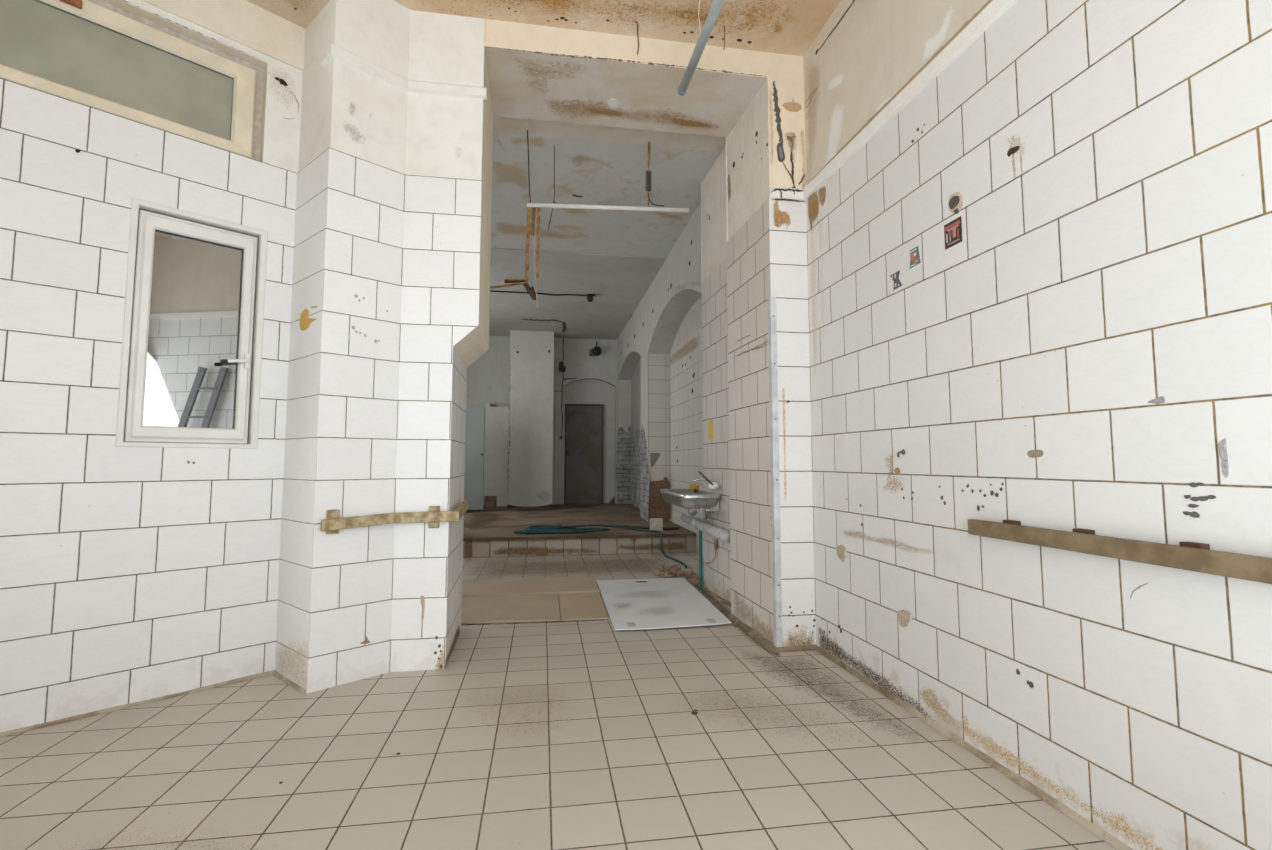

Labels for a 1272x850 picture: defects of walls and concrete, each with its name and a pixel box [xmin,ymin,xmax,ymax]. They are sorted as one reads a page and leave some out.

water stain [455,0,793,44]
water stain [492,47,766,131]
water stain [678,589,1164,850]